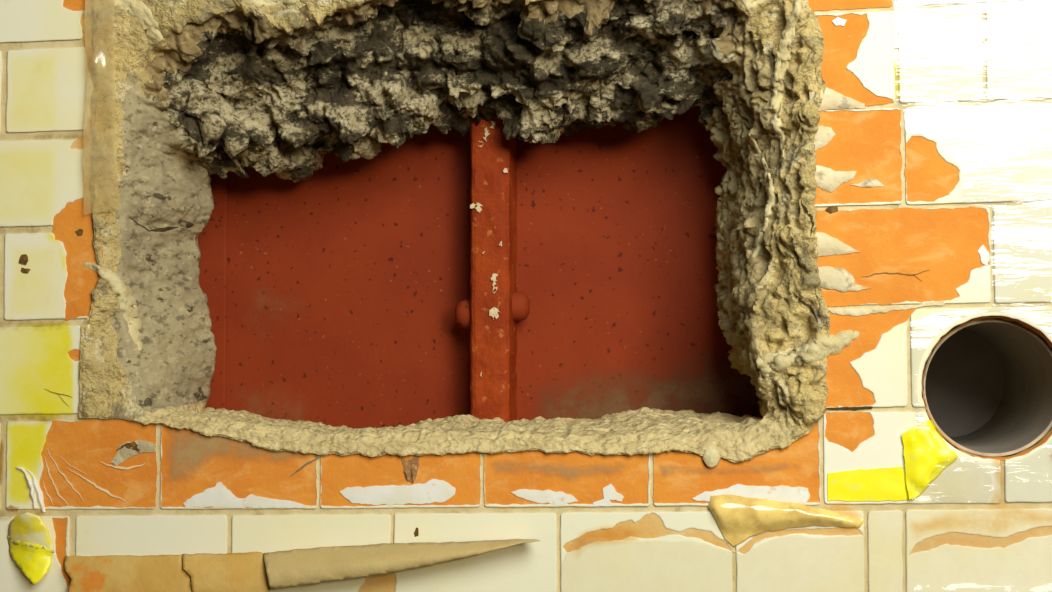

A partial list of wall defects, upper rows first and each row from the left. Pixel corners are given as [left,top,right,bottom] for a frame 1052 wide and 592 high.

spalling [39,0,990,508]
crack [862,270,928,281]
spalling [52,518,70,587]
spalling [563,513,863,554]